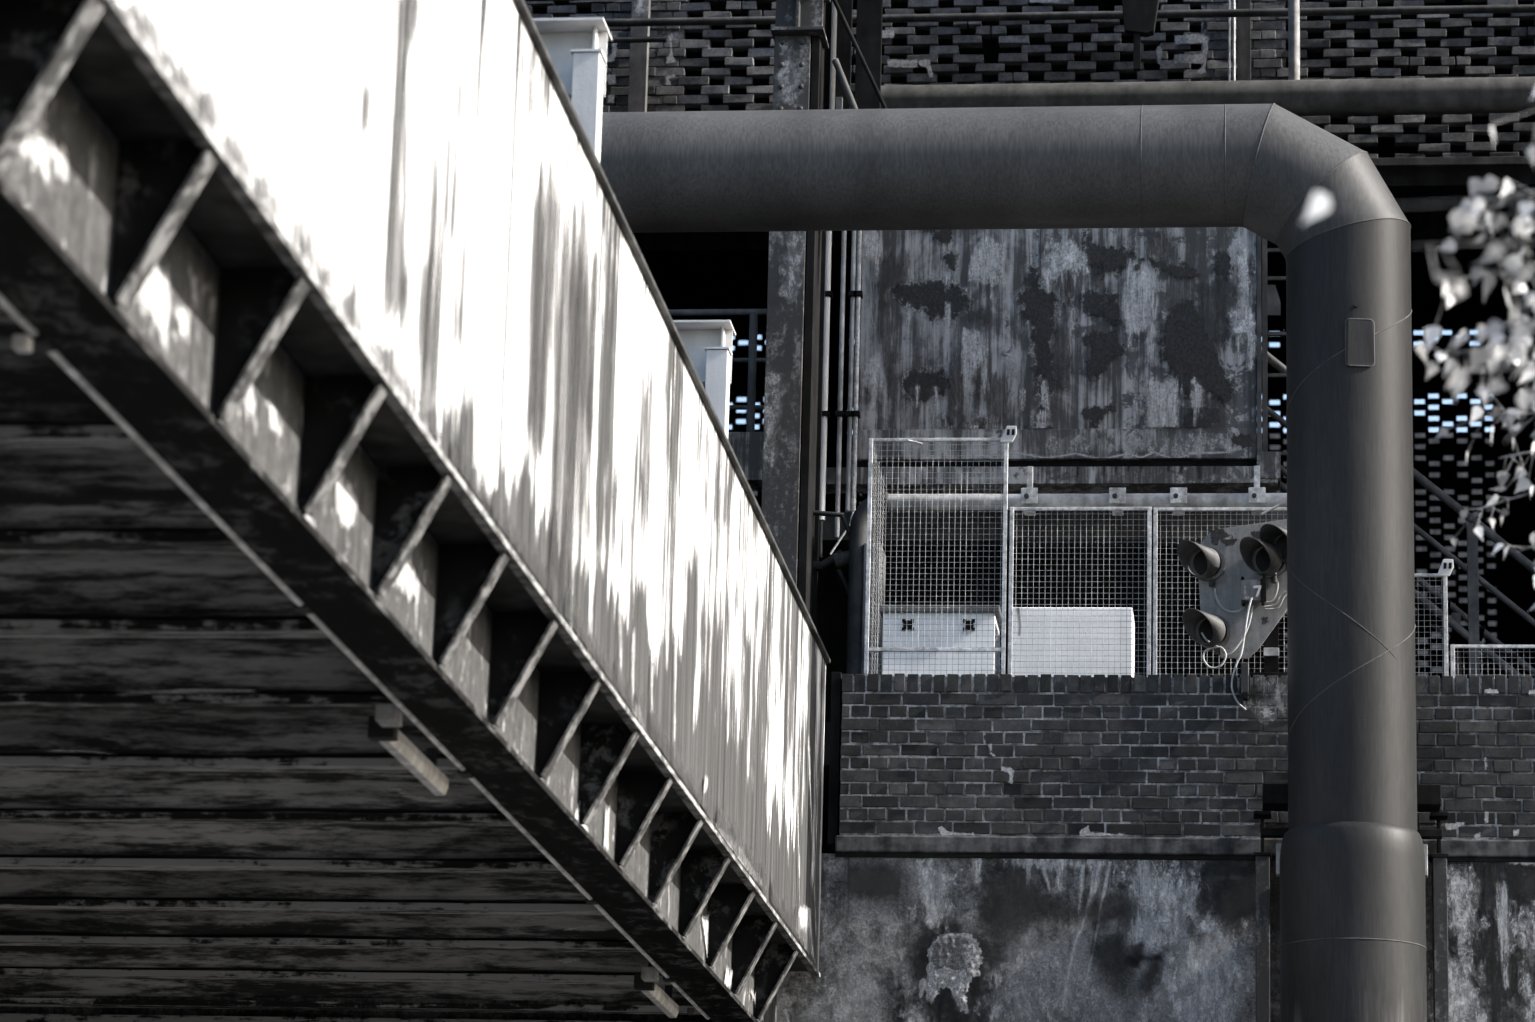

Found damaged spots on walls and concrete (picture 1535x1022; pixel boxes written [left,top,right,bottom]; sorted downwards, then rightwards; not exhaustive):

leakage [383,0,446,435]
peeling [887,230,991,334]
peeling [901,366,995,429]
corrosion [944,352,1009,426]
peeling [1011,262,1060,428]
corrosion [1050,272,1076,391]
peeling [1078,228,1253,449]
leakage [619,613,653,711]
leakage [796,742,1256,1022]
spalling [919,930,983,1014]
leakage [1431,862,1535,1022]